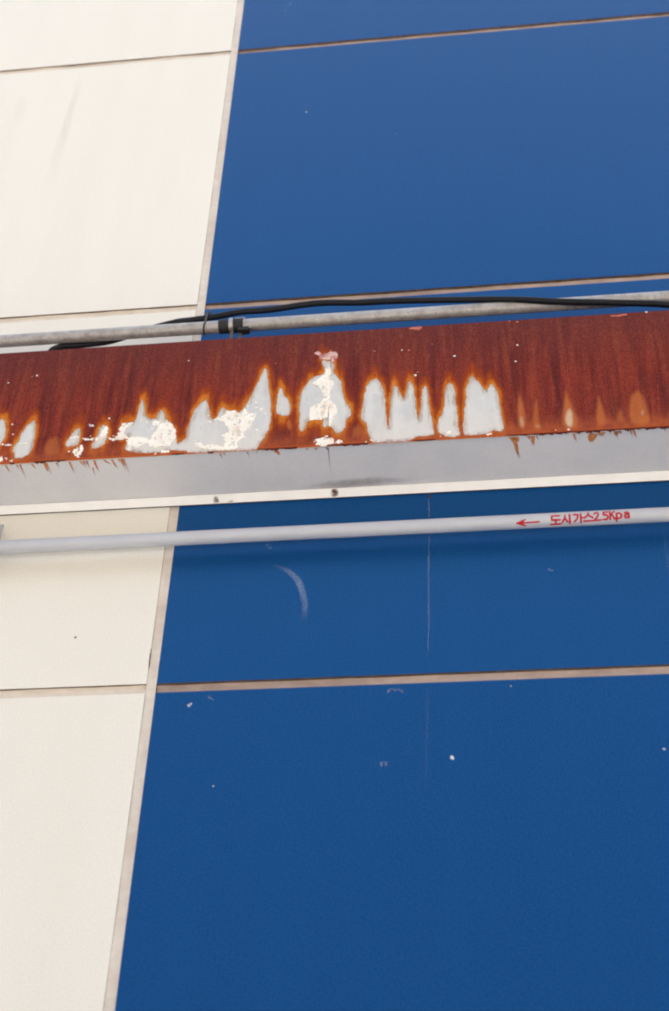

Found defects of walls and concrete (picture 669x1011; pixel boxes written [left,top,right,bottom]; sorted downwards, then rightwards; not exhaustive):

peeling [68,418,176,457]
peeling [194,401,267,450]
peeling [309,350,343,447]
rust [0,310,669,471]